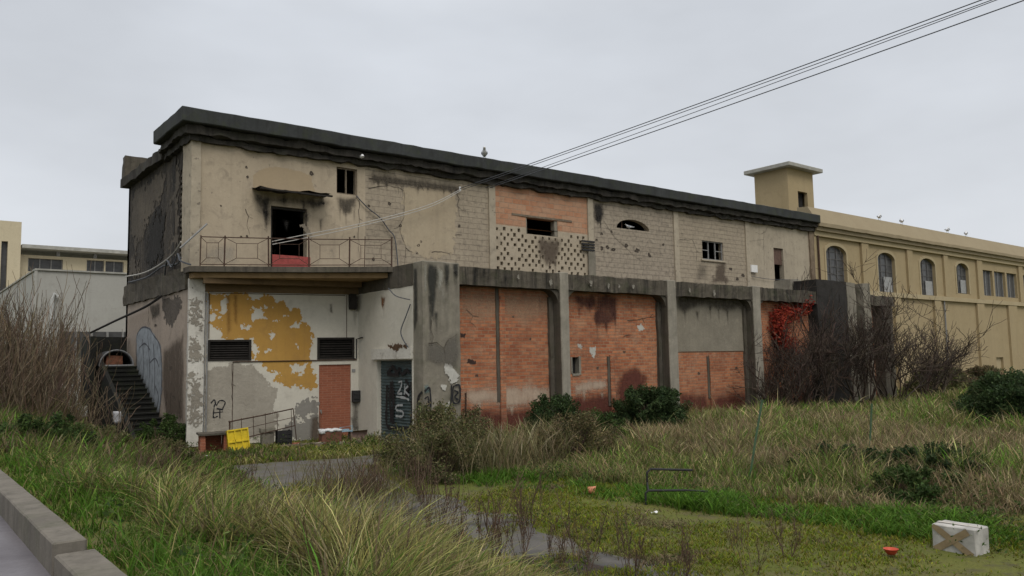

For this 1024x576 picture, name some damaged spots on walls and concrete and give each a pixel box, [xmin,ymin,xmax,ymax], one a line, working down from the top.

damp [414,264,458,328]
peeling [155,292,319,440]
damp [428,337,459,365]
spalling [441,363,460,417]
damp [463,387,549,428]
damp [575,368,647,417]